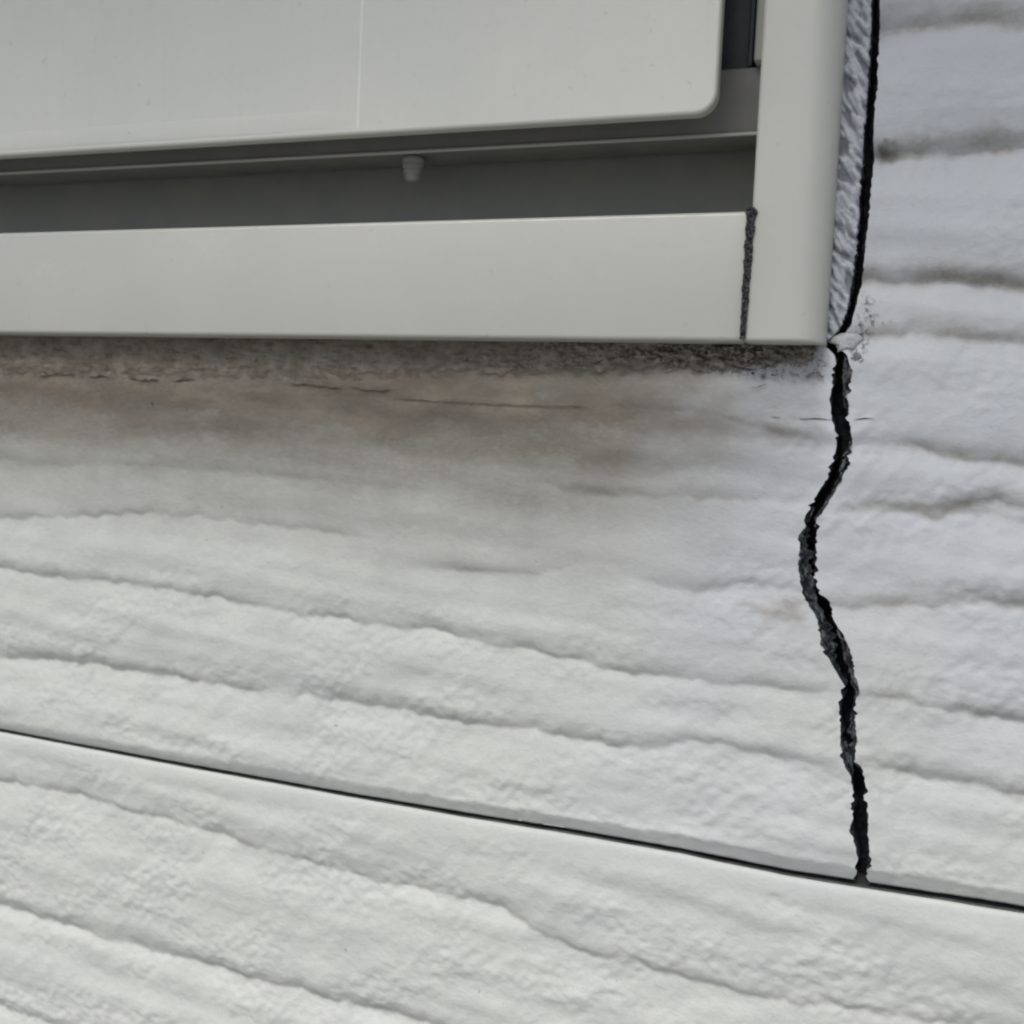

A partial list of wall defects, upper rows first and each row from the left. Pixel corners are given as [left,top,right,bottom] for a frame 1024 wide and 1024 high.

crack [41,374,194,382]
leakage [0,349,693,465]
crack [290,383,584,408]
crack [590,0,880,884]